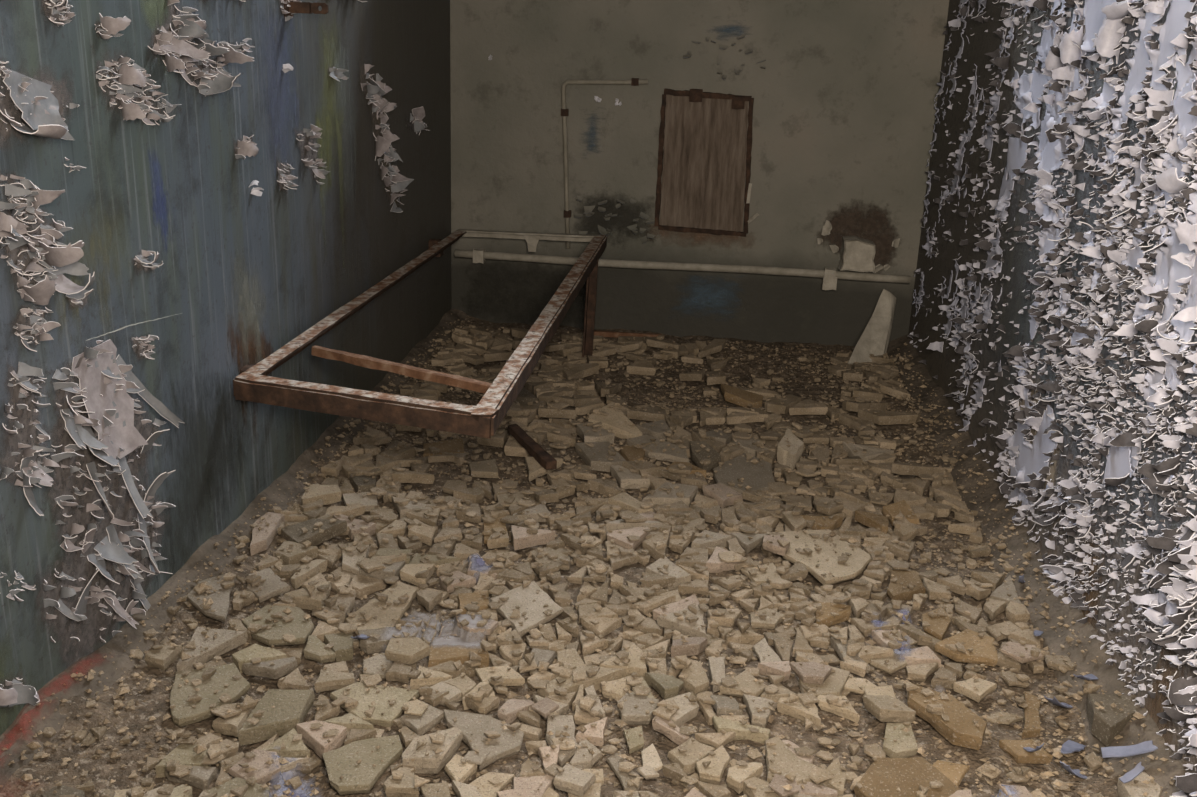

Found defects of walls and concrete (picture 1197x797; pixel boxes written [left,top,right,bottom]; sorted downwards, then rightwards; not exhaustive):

peeling [0,61,79,146]
peeling [94,13,131,39]
peeling [96,54,182,125]
peeling [148,0,255,96]
peeling [280,0,301,21]
peeling [0,174,184,665]
peeling [909,0,1197,797]
peeling [0,676,40,708]